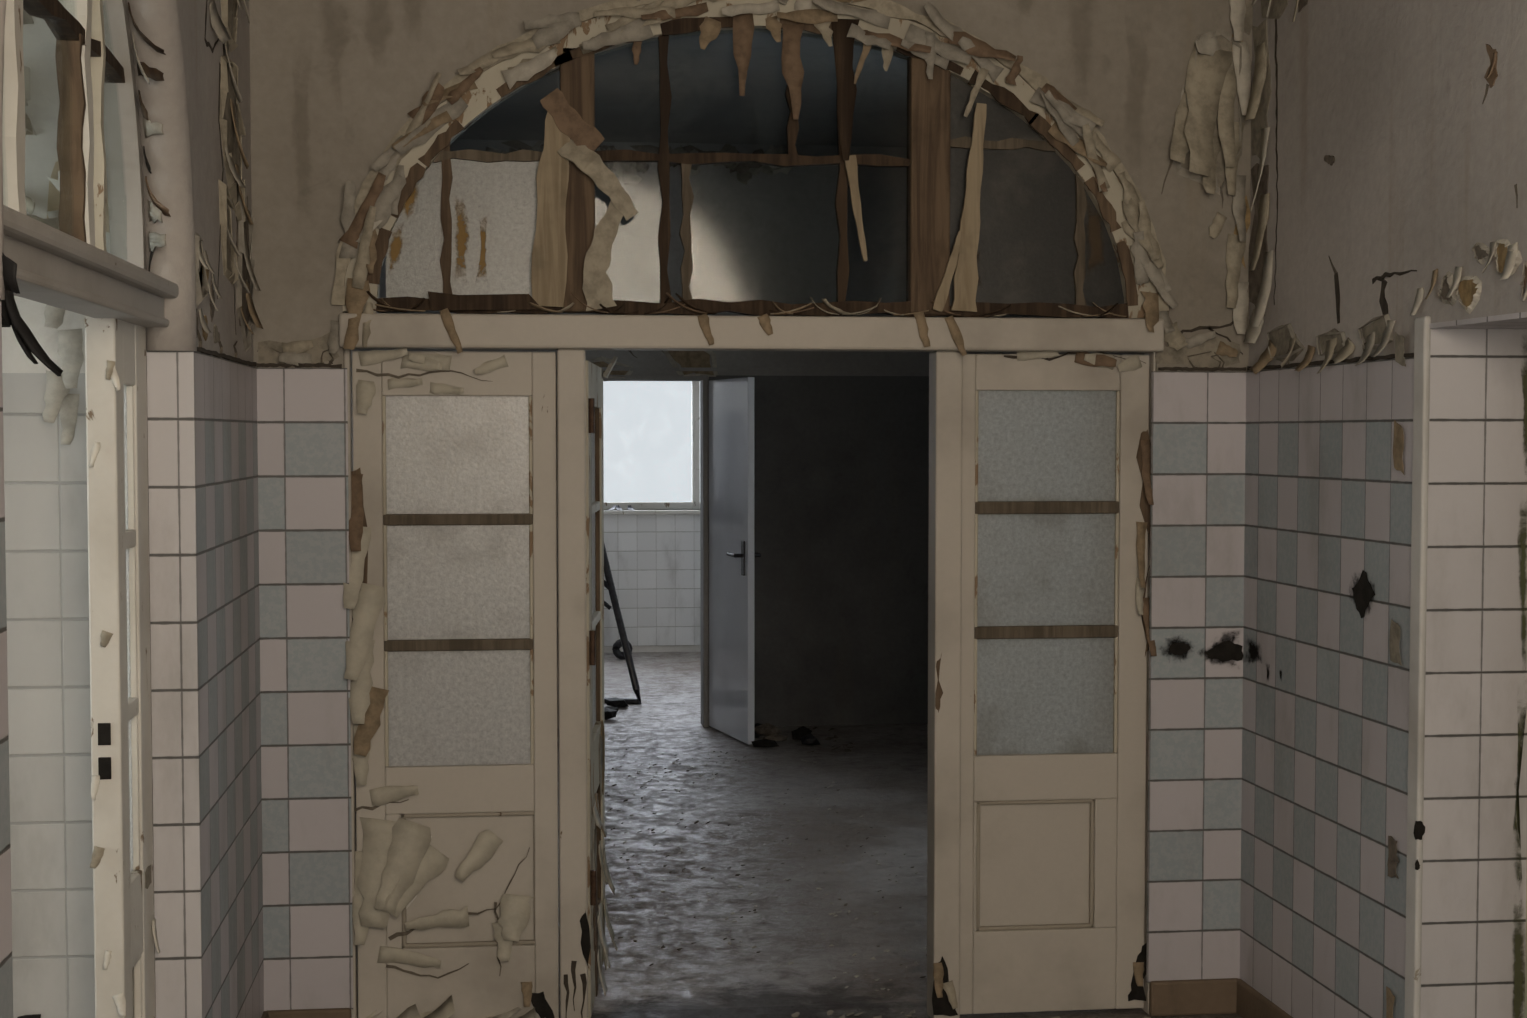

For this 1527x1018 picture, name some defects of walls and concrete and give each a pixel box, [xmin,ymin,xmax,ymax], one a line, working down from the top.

peeling [195,0,1527,414]
peeling [1393,420,1405,475]
spalling [1350,570,1375,618]
peeling [1389,619,1402,666]
peeling [1387,836,1420,879]